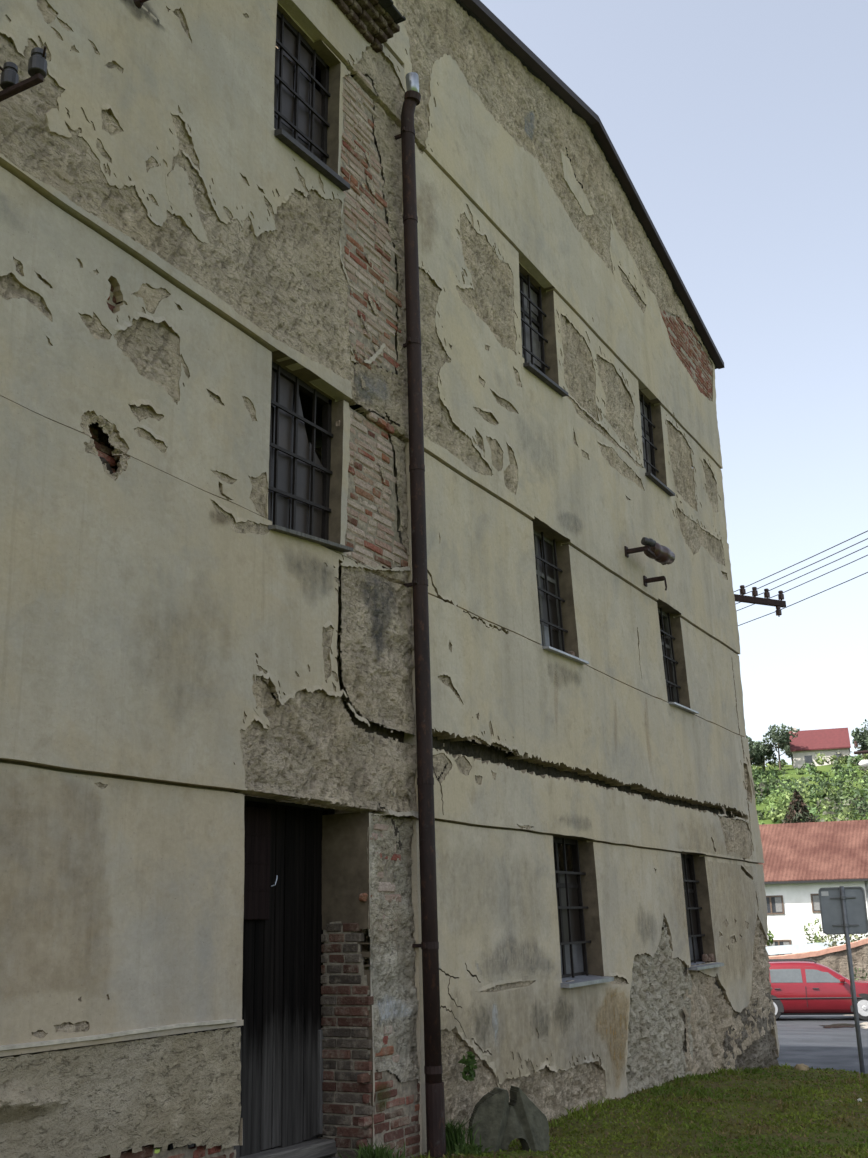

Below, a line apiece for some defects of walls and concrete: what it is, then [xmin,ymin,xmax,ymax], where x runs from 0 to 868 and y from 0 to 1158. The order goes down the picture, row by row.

peeling [395,0,713,401]
peeling [419,205,521,494]
peeling [557,313,644,500]
peeling [0,0,420,1158]
peeling [666,414,728,579]
peeling [438,671,463,704]
peeling [433,750,496,785]
spalling [467,714,521,756]
crack [343,702,737,841]
peeling [476,981,533,992]
spalling [441,1030,606,1144]
spalling [608,917,778,1095]